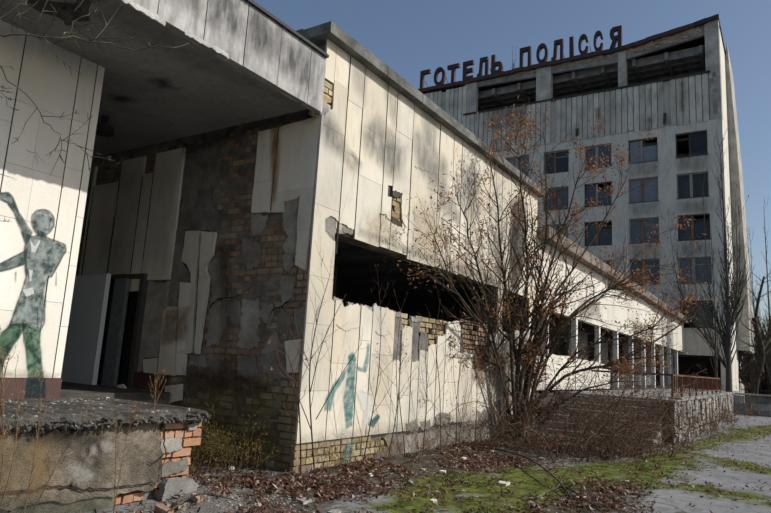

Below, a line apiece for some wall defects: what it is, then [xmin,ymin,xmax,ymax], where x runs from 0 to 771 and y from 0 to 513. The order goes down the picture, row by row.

spalling [27,0,92,26]
spalling [121,0,166,26]
spalling [183,29,229,60]
spalling [388,186,403,227]
spalling [325,216,353,239]
flaking render [188,199,306,381]
flaking render [156,477,199,501]